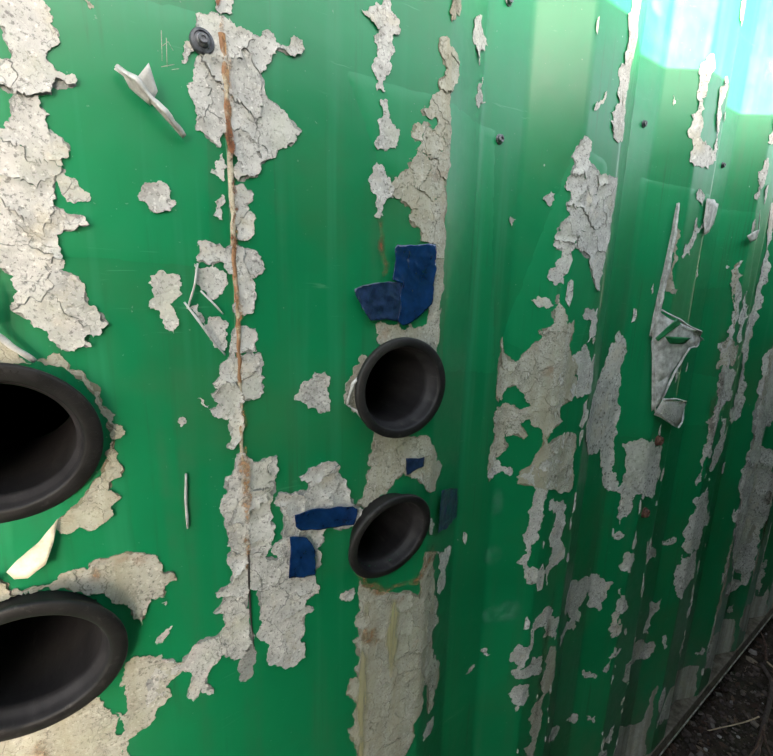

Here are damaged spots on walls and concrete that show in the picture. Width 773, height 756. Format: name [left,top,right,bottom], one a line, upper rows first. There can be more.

peeling [449,0,462,21]
peeling [472,14,487,66]
peeling [476,77,485,108]
rust [225,100,235,161]
peeling [368,36,460,352]
peeling [487,135,662,585]
rust [239,447,252,521]